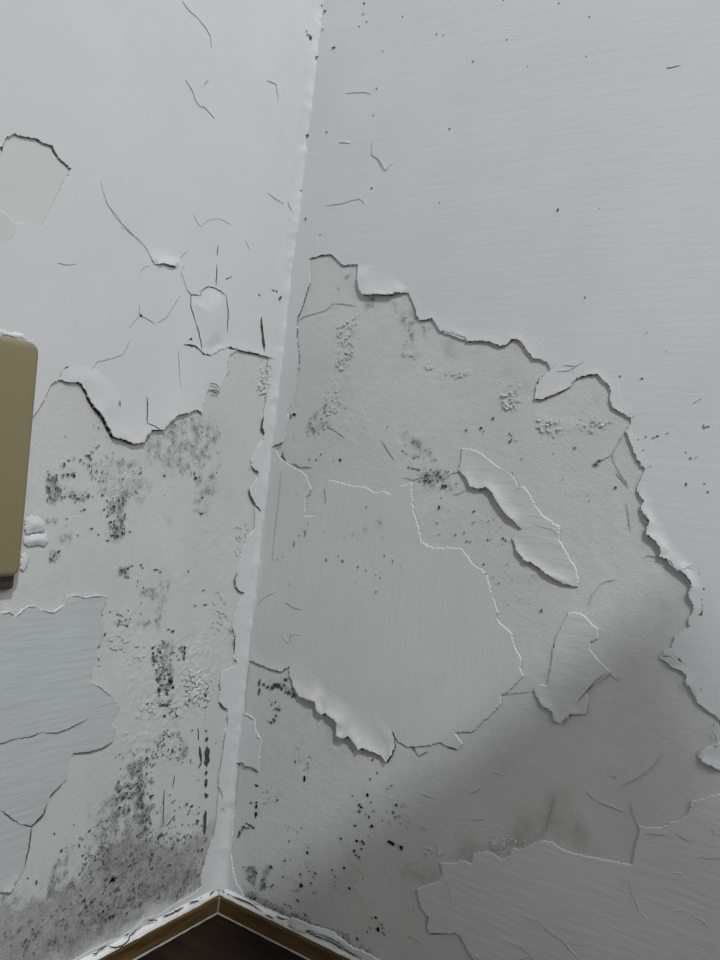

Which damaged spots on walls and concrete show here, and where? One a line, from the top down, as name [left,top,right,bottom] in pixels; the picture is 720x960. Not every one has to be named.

peeling [0,134,70,242]
crack [92,181,186,369]
crack [258,317,266,352]
leakage [46,445,142,541]
leakage [401,434,457,491]
peeling [0,336,276,960]
peeling [231,254,720,960]
leakage [258,678,295,725]
leakage [0,629,217,960]
leakage [243,827,319,926]
leakage [331,793,405,895]